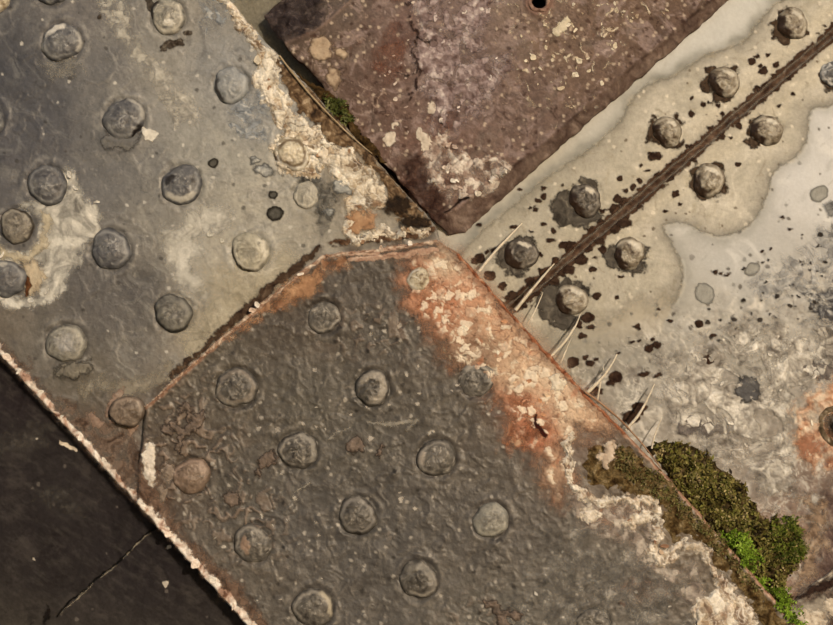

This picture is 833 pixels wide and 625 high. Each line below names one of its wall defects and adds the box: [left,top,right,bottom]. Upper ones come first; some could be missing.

corrosion [770,7,790,45]
corrosion [226,256,348,338]
corrosion [395,22,833,508]
crack [43,526,157,624]
corrosion [794,486,833,608]